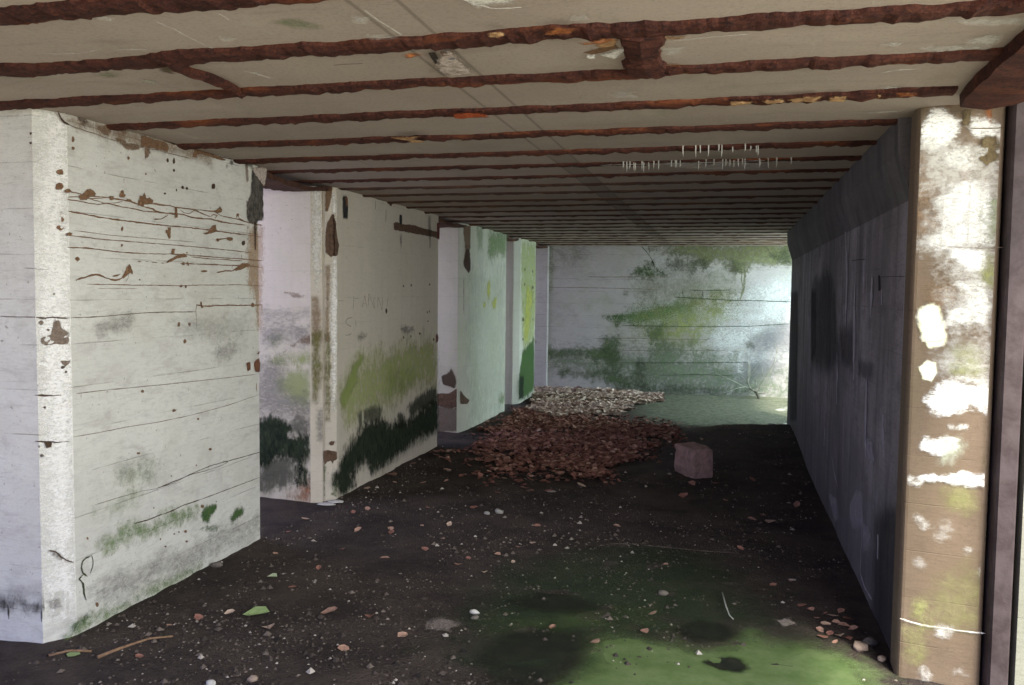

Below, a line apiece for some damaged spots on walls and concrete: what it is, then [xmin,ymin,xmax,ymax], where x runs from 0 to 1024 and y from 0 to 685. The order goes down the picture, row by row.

spalling [429,51,471,76]
damp [617,144,777,172]
damp [918,154,958,199]
spalling [246,167,267,250]
spalling [325,214,339,257]
peeling [917,107,1004,348]
damp [259,365,310,491]
damp [333,370,456,495]
spalling [437,389,469,432]
peeling [919,361,989,460]
damp [909,471,985,488]
damp [900,618,986,636]